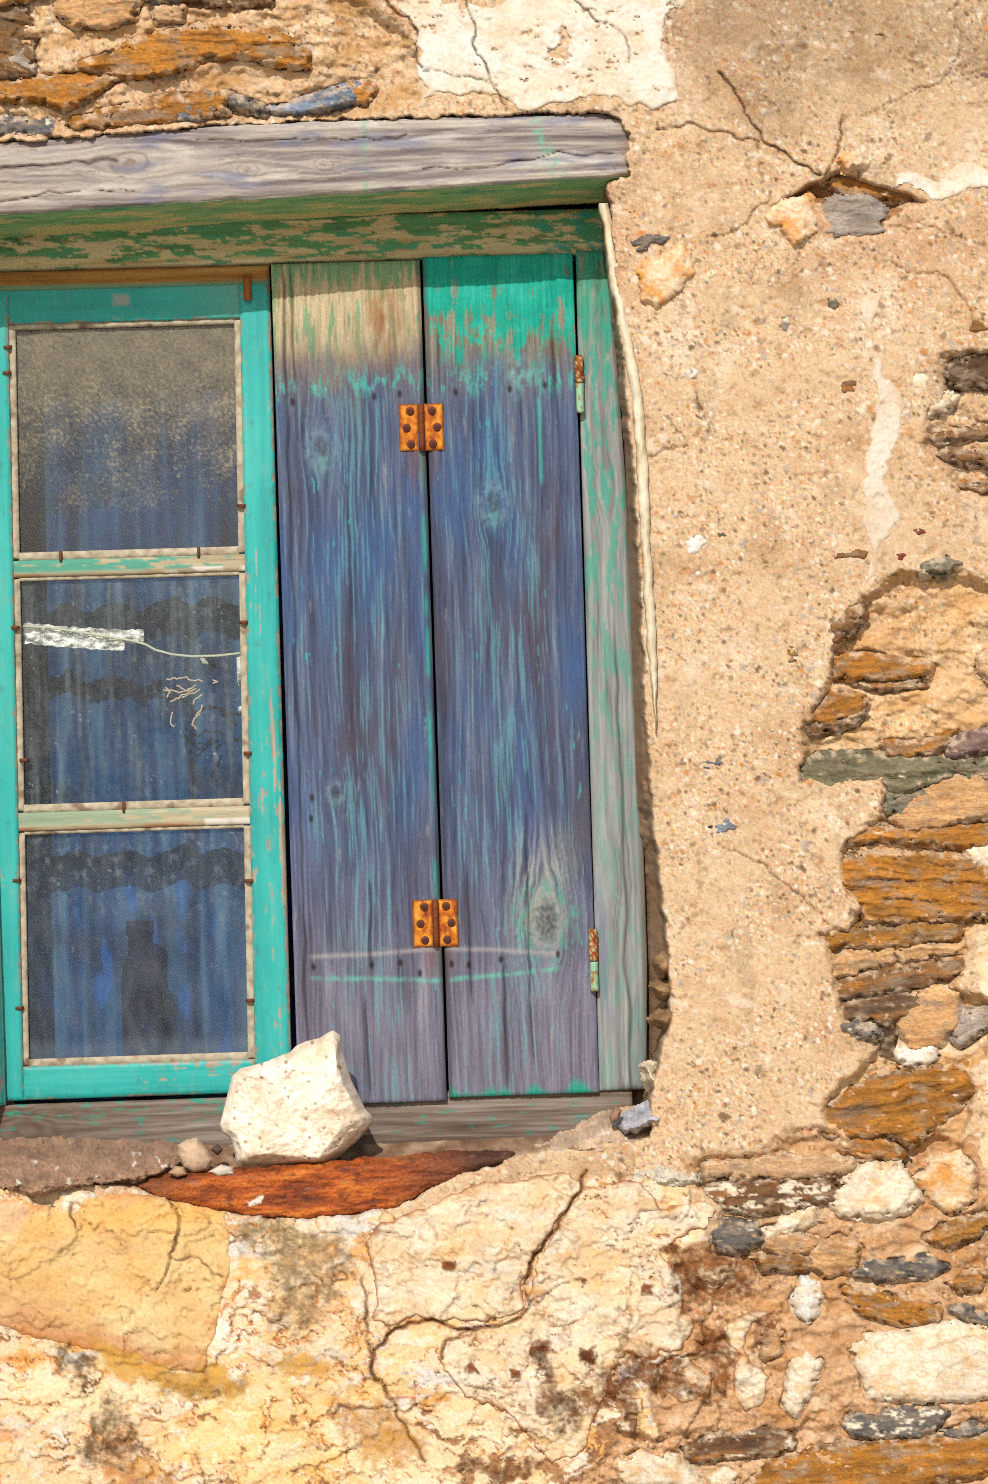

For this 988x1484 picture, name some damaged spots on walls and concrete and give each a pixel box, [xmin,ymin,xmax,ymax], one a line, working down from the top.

spalling [0,0,686,143]
crack [719,73,842,174]
spalling [771,150,988,240]
peeling [860,292,883,333]
spalling [365,349,988,1484]
crack [338,1173,586,1462]